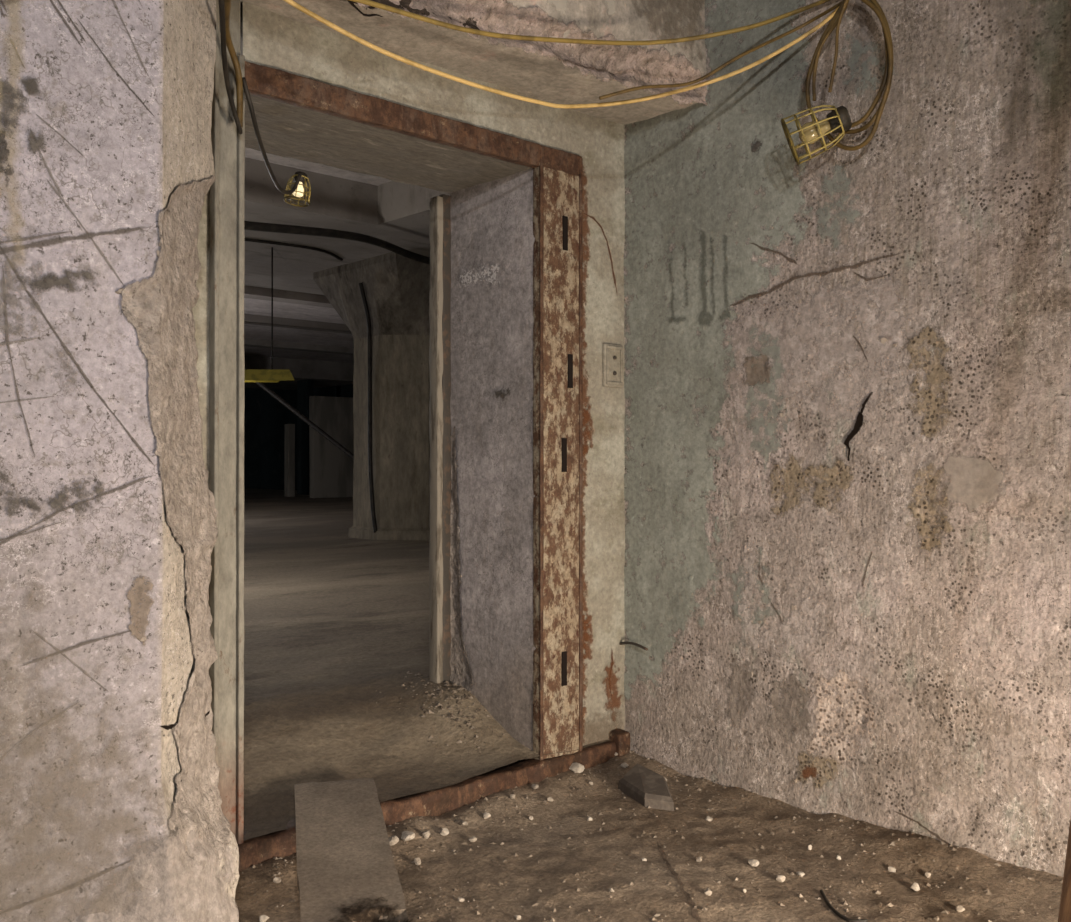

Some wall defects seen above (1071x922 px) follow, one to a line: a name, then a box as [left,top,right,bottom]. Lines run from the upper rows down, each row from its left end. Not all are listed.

leakage [0,134,9,172]
crack [730,243,900,306]
peeling [356,0,953,700]
crack [844,392,873,461]
crack [160,723,177,731]
spalling [768,670,880,789]